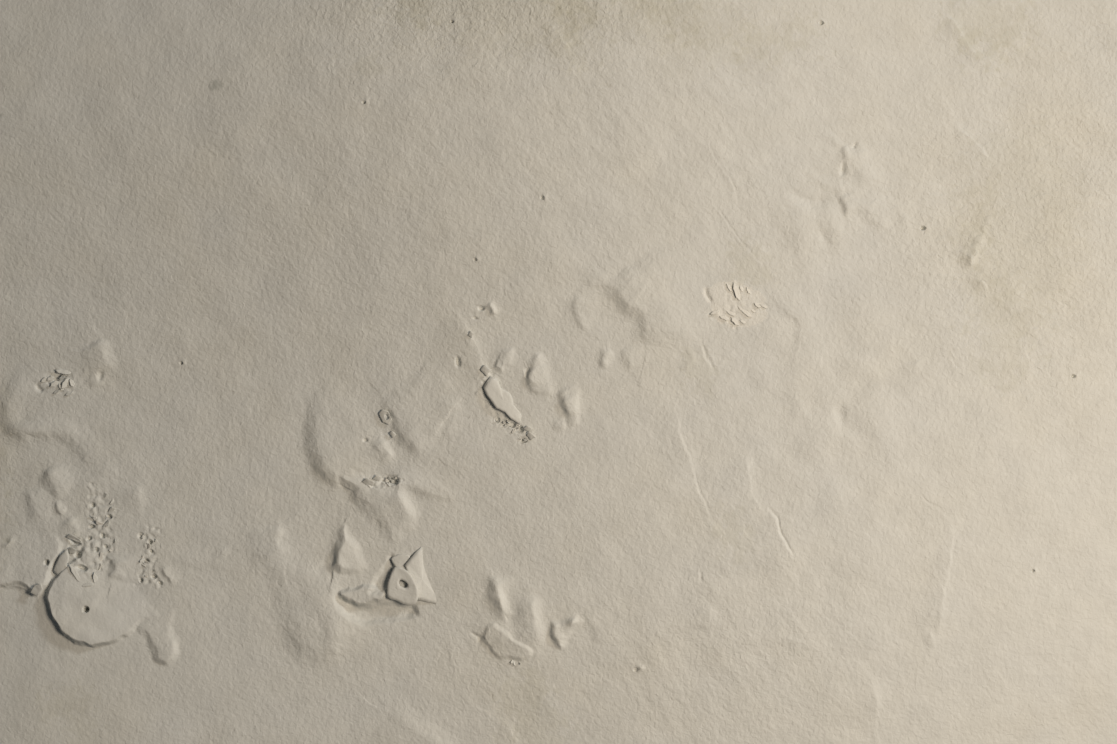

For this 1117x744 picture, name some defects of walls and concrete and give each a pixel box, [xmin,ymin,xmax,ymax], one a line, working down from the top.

spalling [34,369,75,396]
spalling [442,299,536,446]
spalling [53,492,180,590]
peeling [320,547,436,658]